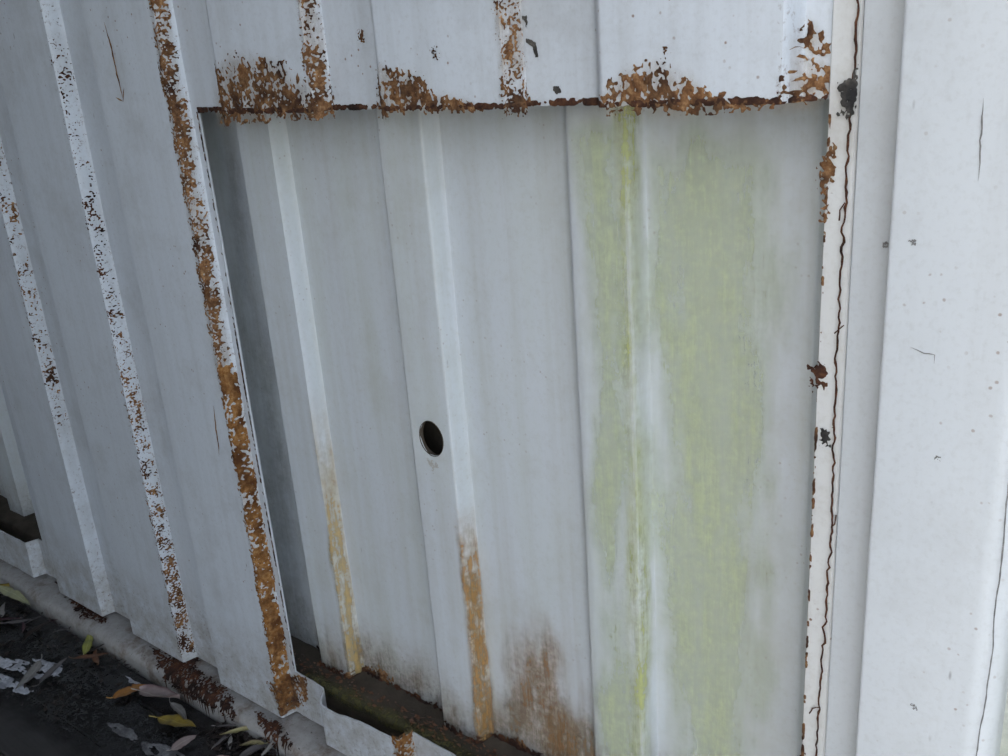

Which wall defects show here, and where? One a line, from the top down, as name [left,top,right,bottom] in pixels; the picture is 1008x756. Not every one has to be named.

rust [0,144,66,430]
rust [48,38,237,722]
rust [147,0,833,756]
rust [815,114,837,243]
crack [809,0,860,756]
leakage [0,599,239,756]
leakage [326,479,364,674]
crack [976,488,1008,756]